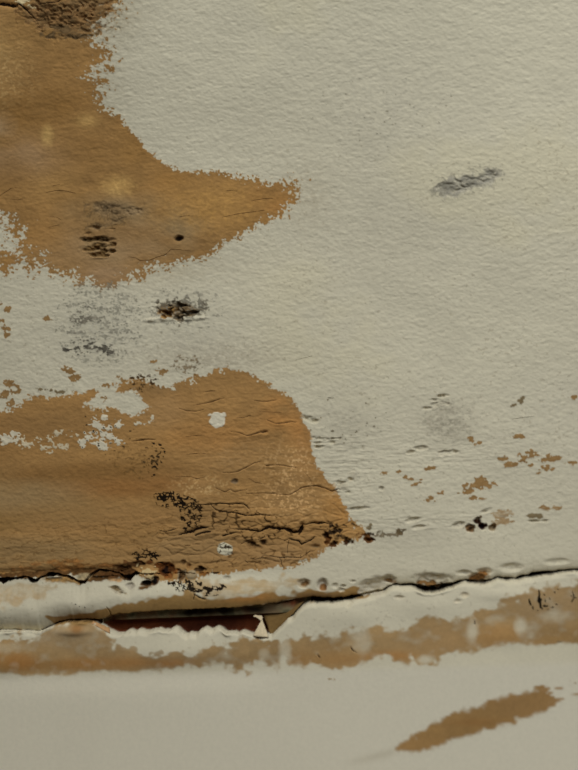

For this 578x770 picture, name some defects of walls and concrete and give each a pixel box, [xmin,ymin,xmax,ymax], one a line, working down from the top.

spalling [13,0,118,56]
spalling [429,159,506,202]
spalling [75,199,150,259]
peeling [37,419,125,454]
peeling [496,448,578,475]
peeling [457,475,498,501]
crack [0,461,338,600]
crack [44,608,111,630]
spalling [91,574,406,637]
crack [310,594,363,604]
crack [384,569,578,594]
leakage [393,680,578,756]